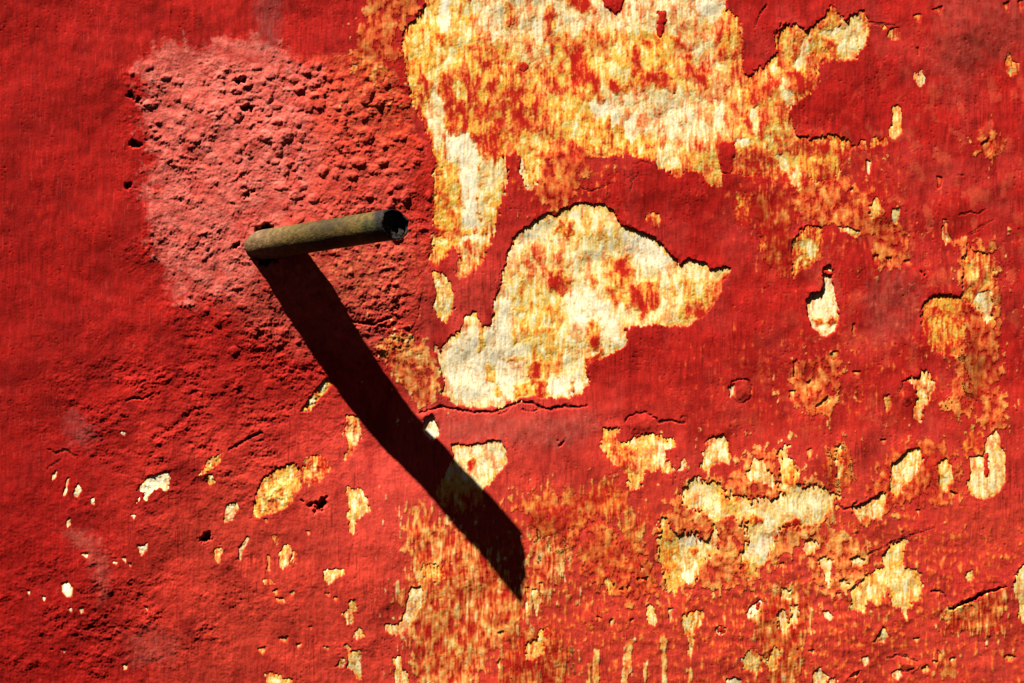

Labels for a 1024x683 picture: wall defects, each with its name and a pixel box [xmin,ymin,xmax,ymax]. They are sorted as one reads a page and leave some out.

peeling [348,0,922,441]
crack [419,401,587,414]
peeling [384,219,1024,683]
peeling [131,472,171,519]
peeling [251,453,331,522]